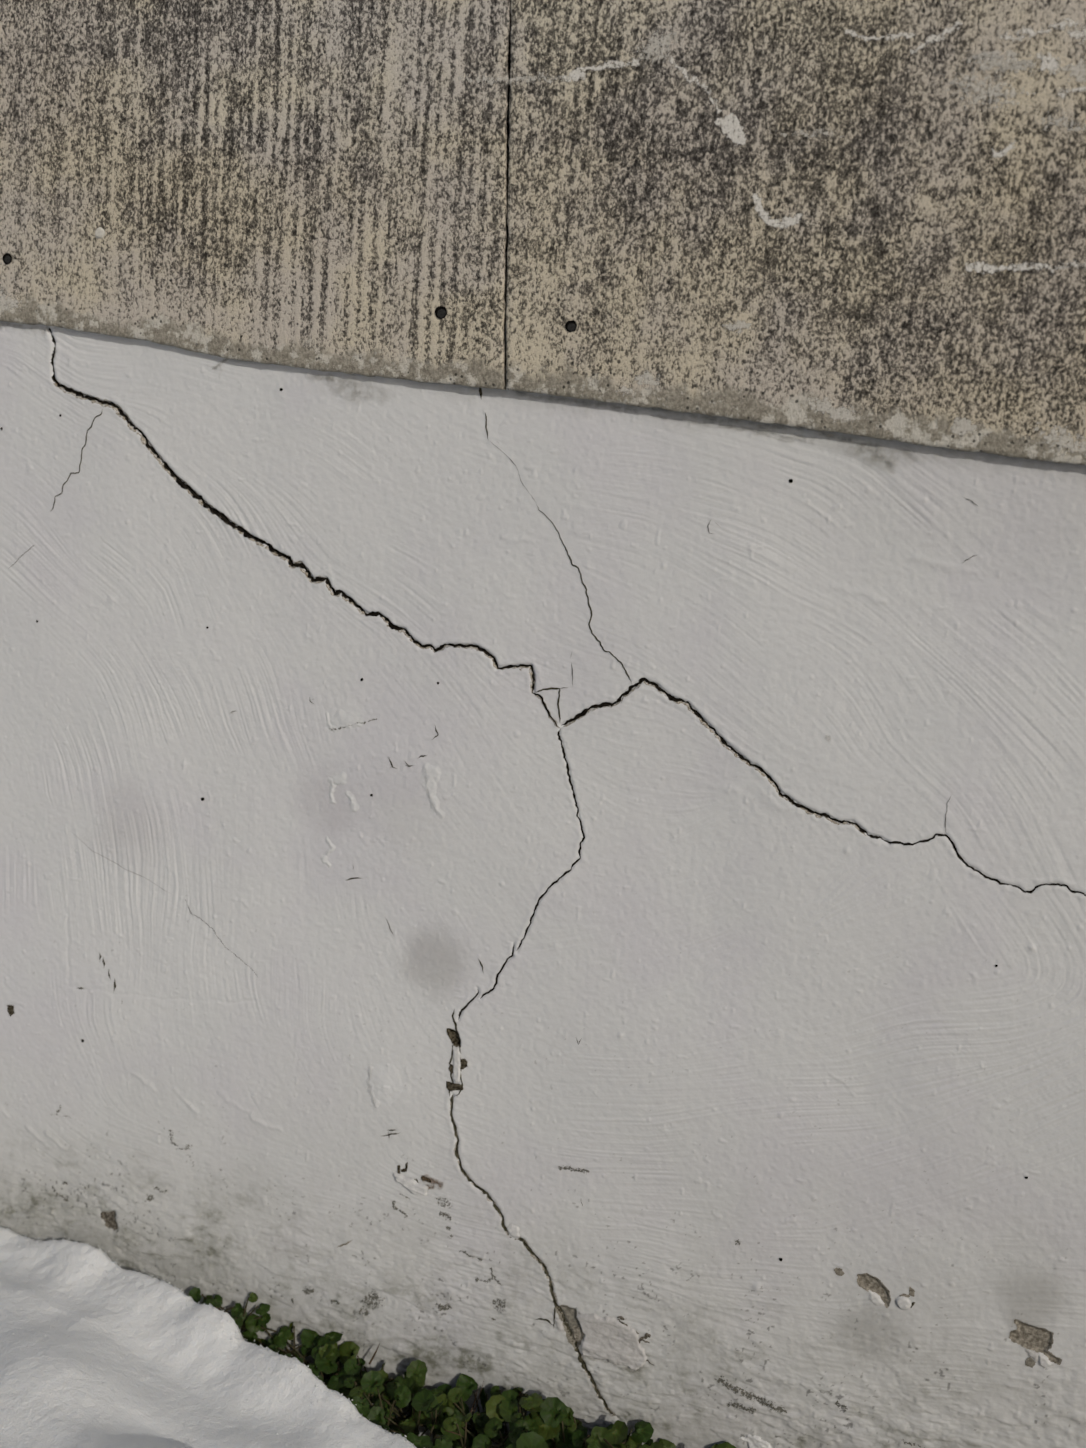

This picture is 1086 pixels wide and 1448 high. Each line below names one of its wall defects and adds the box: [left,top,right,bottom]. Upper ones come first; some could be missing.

crack [49,328,1086,1417]
peeling [393,1162,442,1196]
spalling [834,1268,891,1308]
spalling [1009,1319,1062,1369]